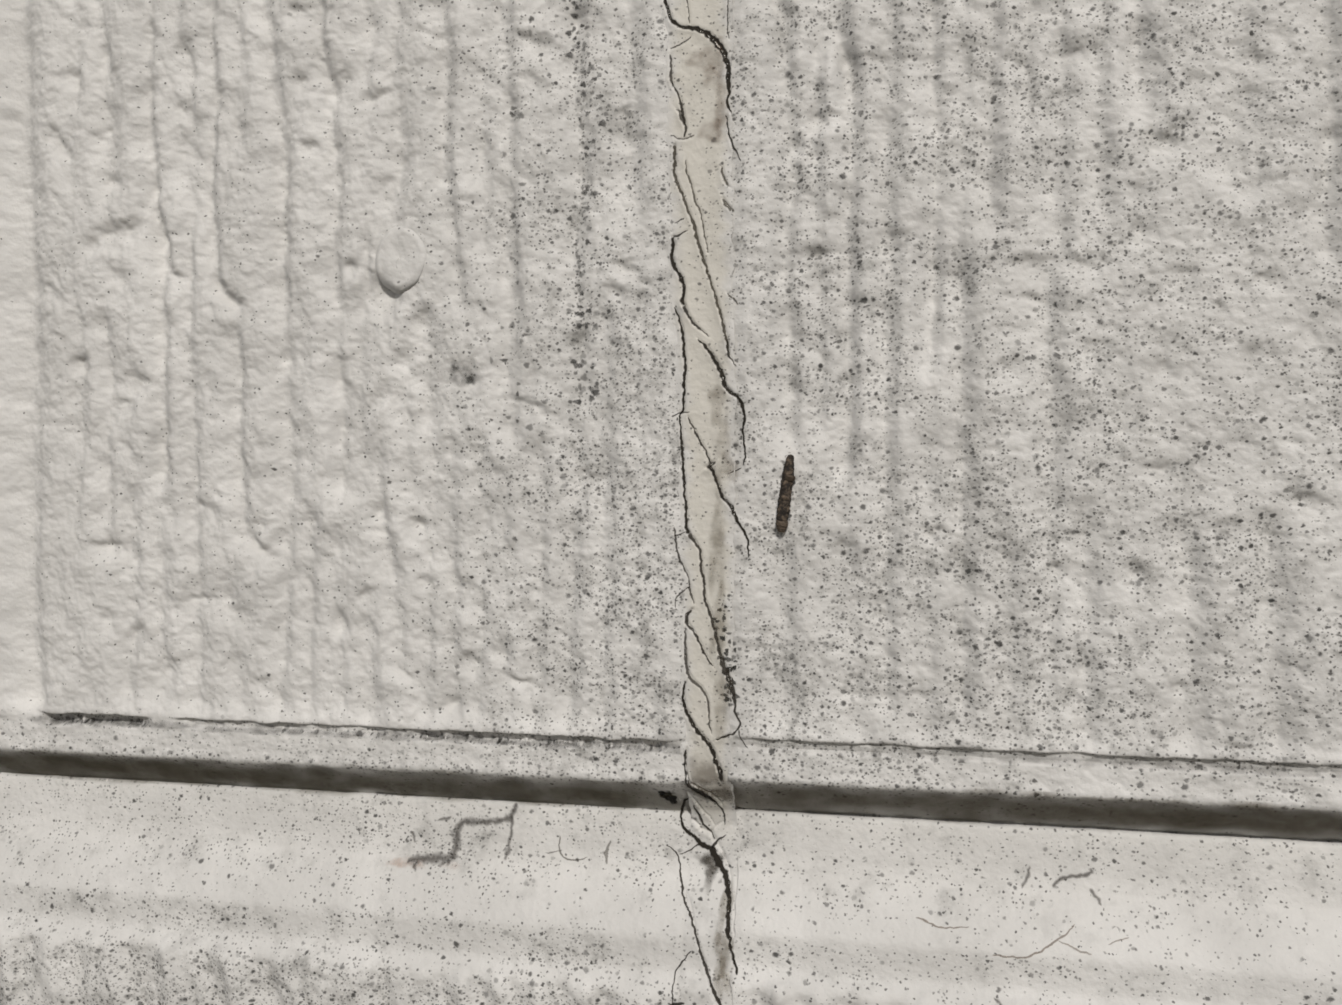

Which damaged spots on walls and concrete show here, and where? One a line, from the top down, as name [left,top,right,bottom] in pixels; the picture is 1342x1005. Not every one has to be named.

crack [408,804,517,867]
crack [663,0,749,1005]